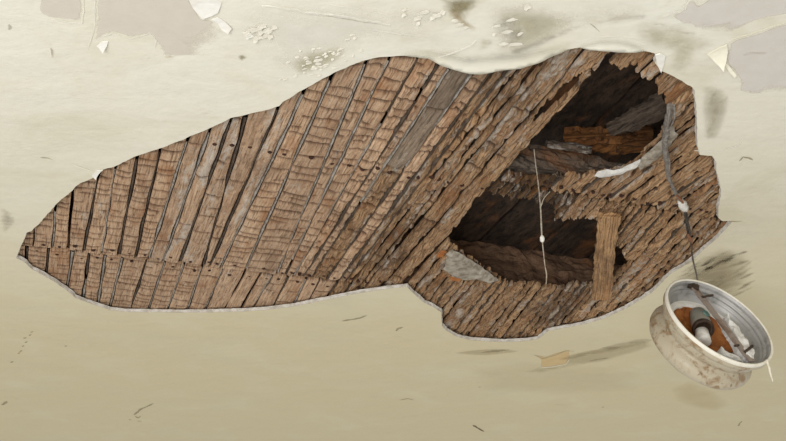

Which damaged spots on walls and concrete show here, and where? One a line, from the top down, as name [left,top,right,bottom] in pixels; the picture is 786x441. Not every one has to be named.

peeling [88,0,232,55]
peeling [279,34,363,80]
damp [451,2,470,30]
spalling [653,53,665,72]
peeling [665,0,786,93]
spalling [16,156,731,342]